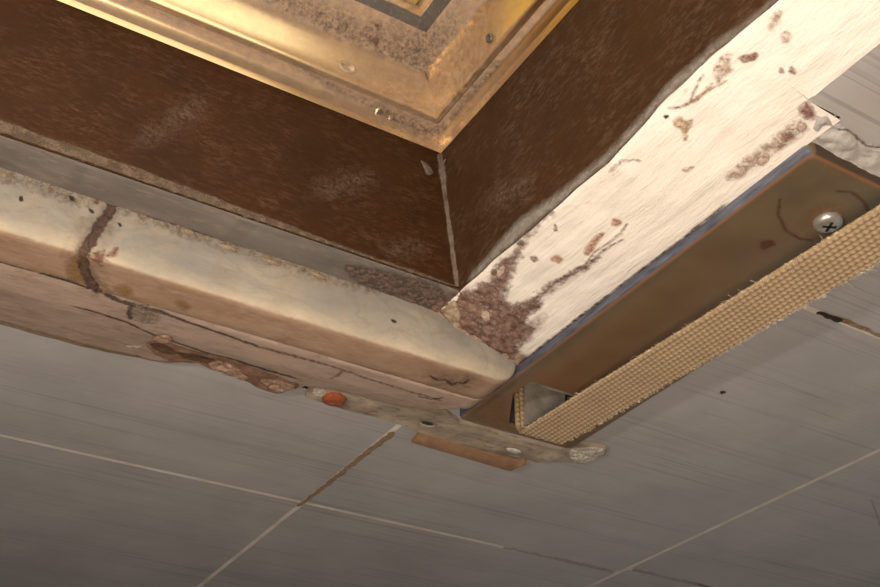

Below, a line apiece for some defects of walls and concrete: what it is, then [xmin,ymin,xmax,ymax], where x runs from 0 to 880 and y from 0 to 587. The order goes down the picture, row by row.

spalling [664,115,692,140]
flaking render [728,103,880,178]
crack [0,204,469,399]
spalling [127,334,298,394]